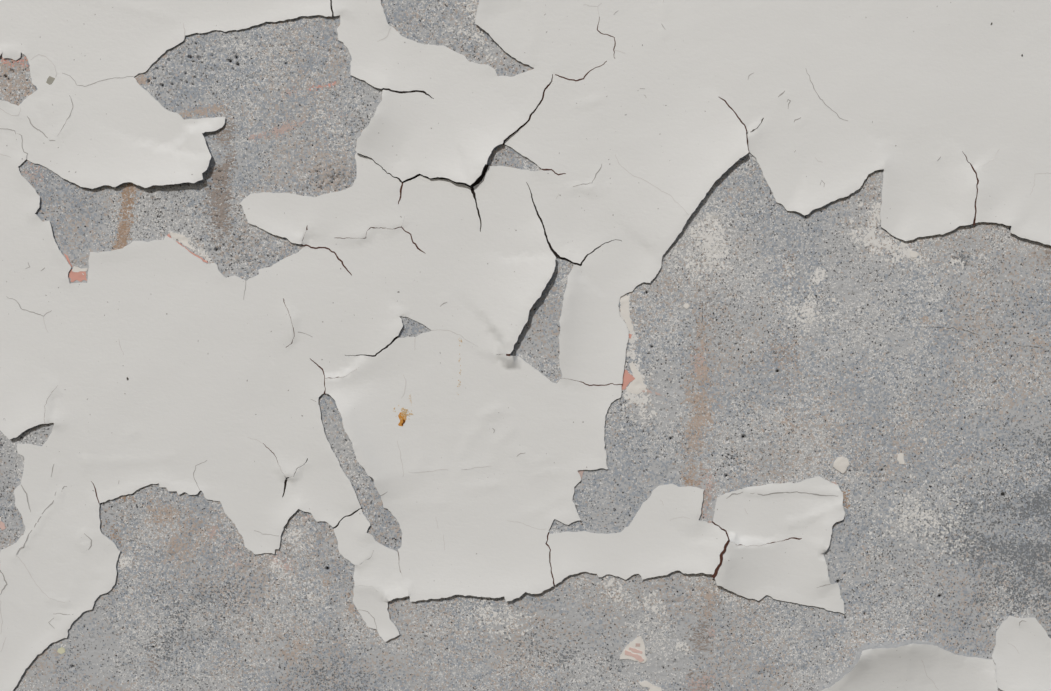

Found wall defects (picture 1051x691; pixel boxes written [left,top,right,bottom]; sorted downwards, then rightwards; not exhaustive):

spalling [0,53,55,105]
crack [0,54,133,158]
spalling [138,25,257,116]
crack [383,88,434,99]
crack [503,4,623,145]
crack [301,151,489,275]
crack [526,155,689,266]
peeling [505,66,1051,387]
peeling [0,352,57,551]
corrosion [394,396,413,426]
spalling [13,152,1051,691]